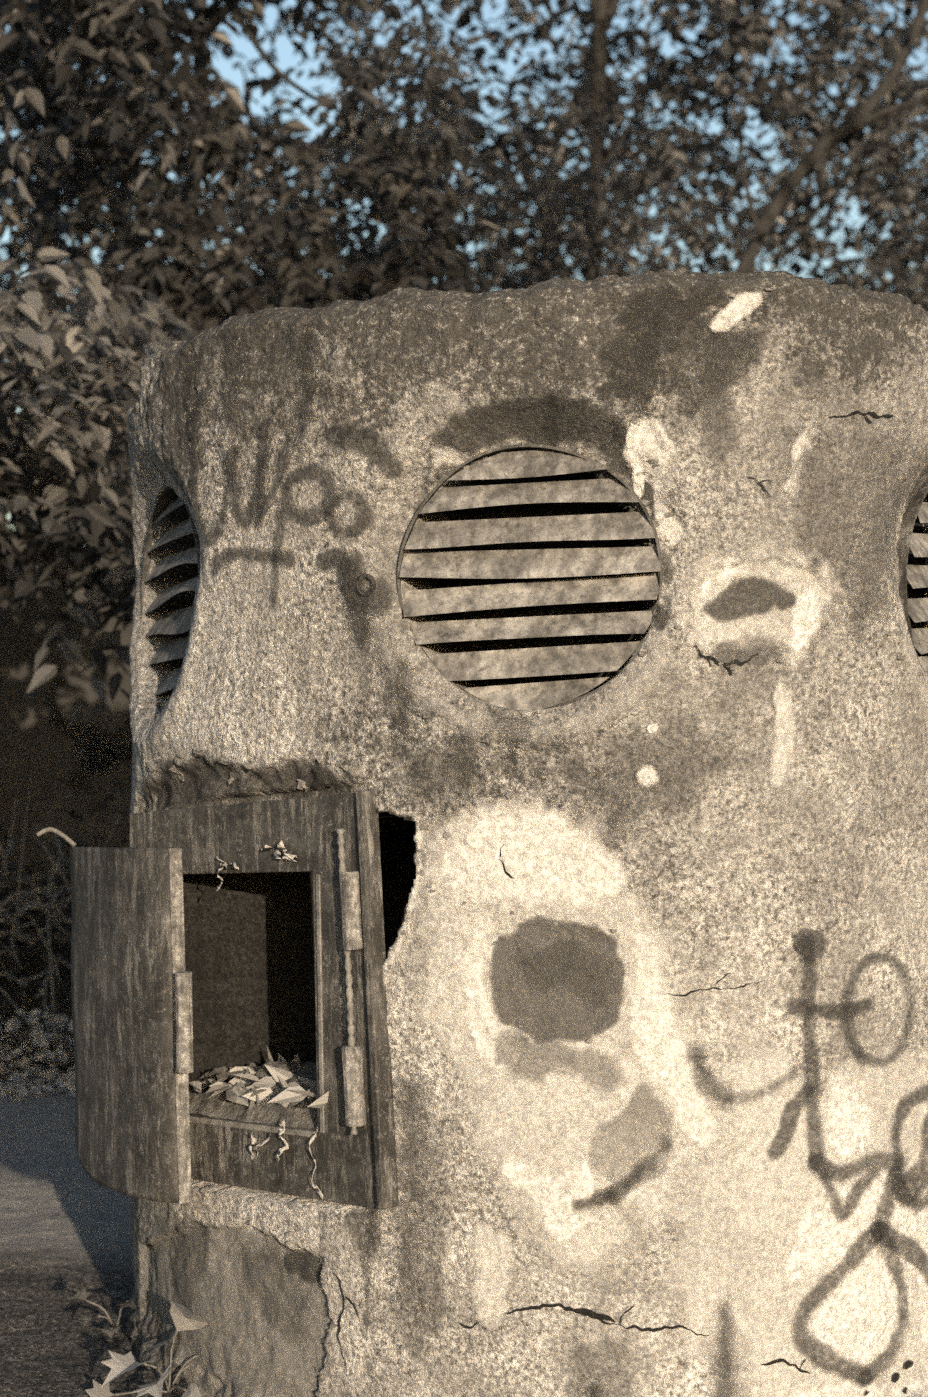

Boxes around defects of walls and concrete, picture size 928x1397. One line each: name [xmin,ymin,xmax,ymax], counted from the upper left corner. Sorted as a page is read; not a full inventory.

spalling [711,288,772,334]
damp [491,917,625,1043]
crack [332,1264,360,1368]
crack [455,1303,709,1336]